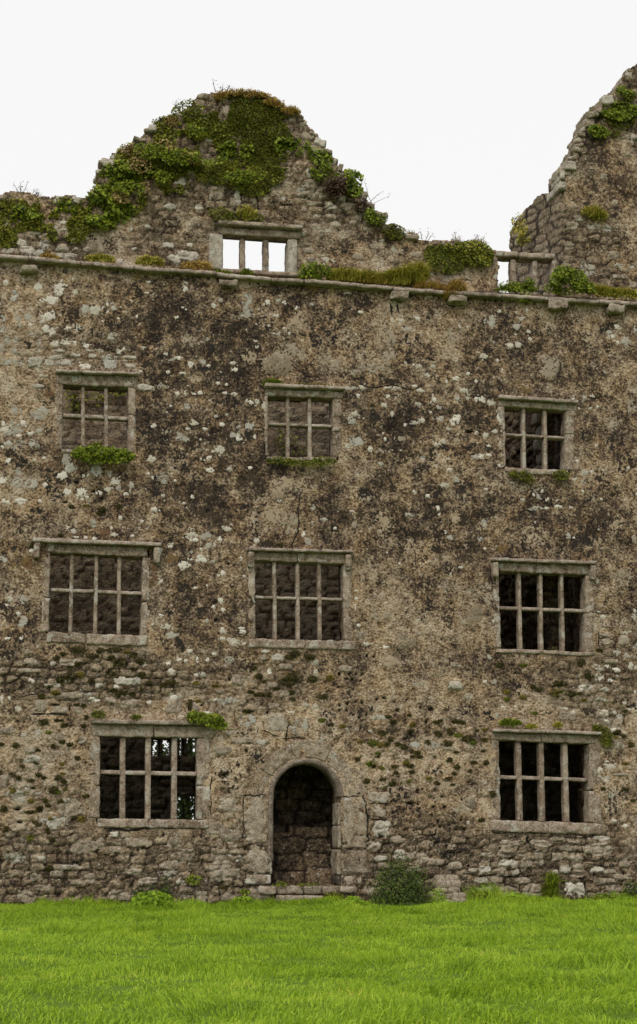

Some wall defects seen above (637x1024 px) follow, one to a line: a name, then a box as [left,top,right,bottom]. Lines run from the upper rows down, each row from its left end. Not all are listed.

damp [233,310,283,352]
damp [264,292,376,392]
damp [391,335,450,381]
damp [462,317,486,351]
damp [565,307,615,402]
damp [349,408,498,631]
damp [490,413,637,565]